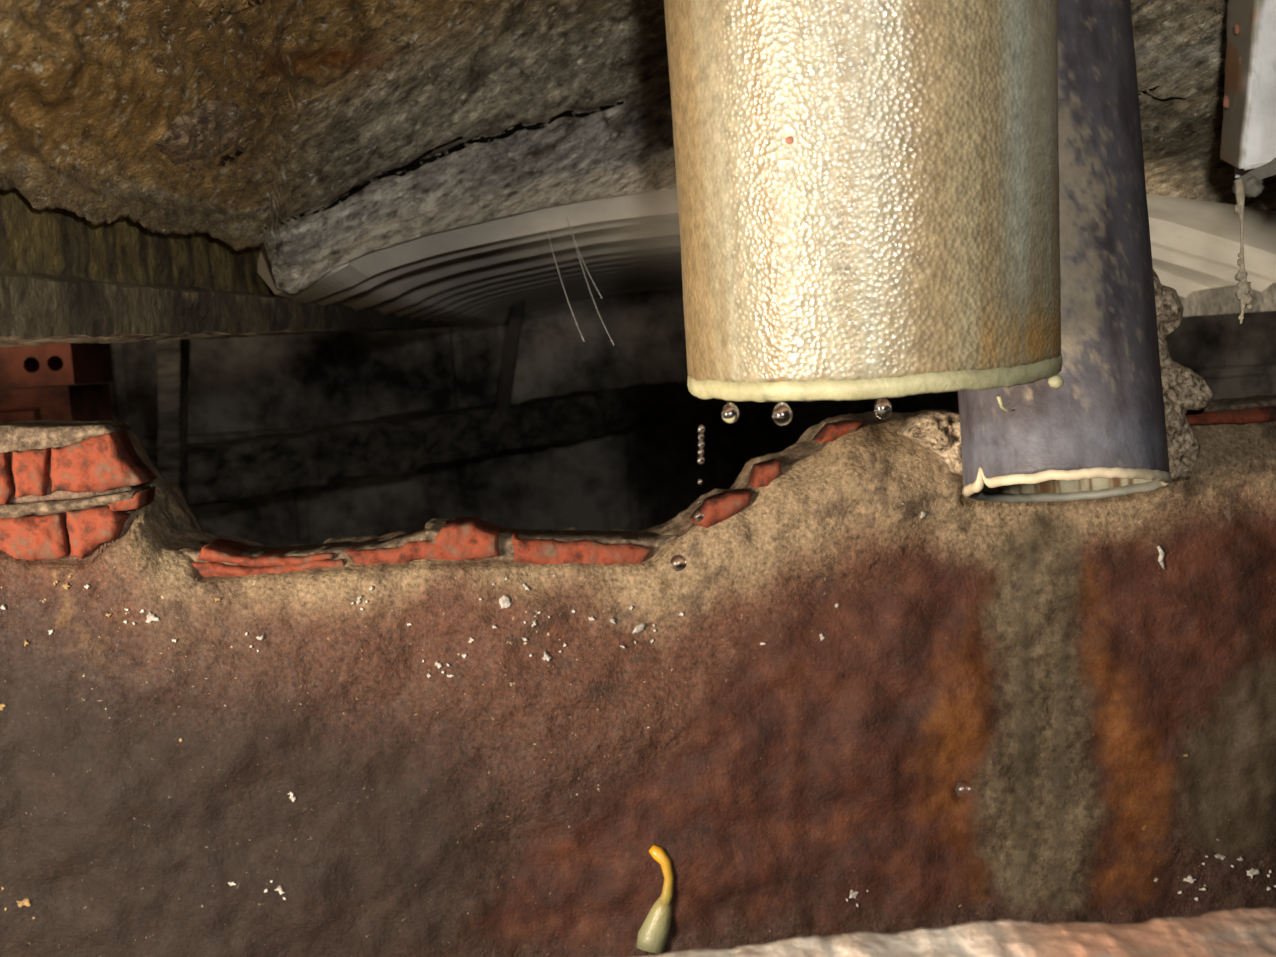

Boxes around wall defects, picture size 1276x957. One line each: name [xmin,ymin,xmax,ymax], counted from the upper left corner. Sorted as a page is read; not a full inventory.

spalling [812,420,864,443]
spalling [0,422,157,561]
spalling [690,458,782,528]
spalling [178,516,677,577]
water stain [123,608,160,625]
water stain [492,577,512,609]
water stain [522,611,567,661]
water stain [620,624,656,648]
water stain [979,528,1101,907]
corrosion [483,566,983,945]
water stain [1202,838,1276,891]
water stain [636,845,674,954]